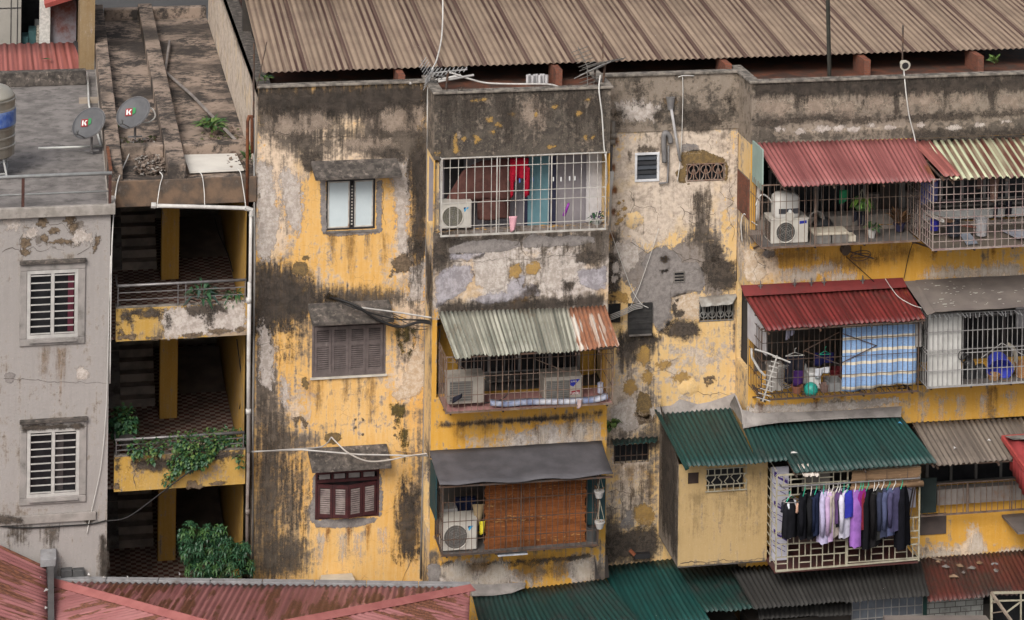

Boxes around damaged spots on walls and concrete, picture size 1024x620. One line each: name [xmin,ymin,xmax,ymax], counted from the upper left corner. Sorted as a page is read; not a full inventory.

water stain [753,75,1024,117]
water stain [912,127,1024,141]
peeling [0,216,101,256]
peeling [255,157,306,262]
water stain [251,80,621,358]
peeling [344,106,644,307]
crack [630,179,736,302]
water stain [701,245,736,292]
peeling [118,299,309,429]
peeling [610,345,717,433]
water stain [378,476,421,565]
water stain [605,405,679,564]